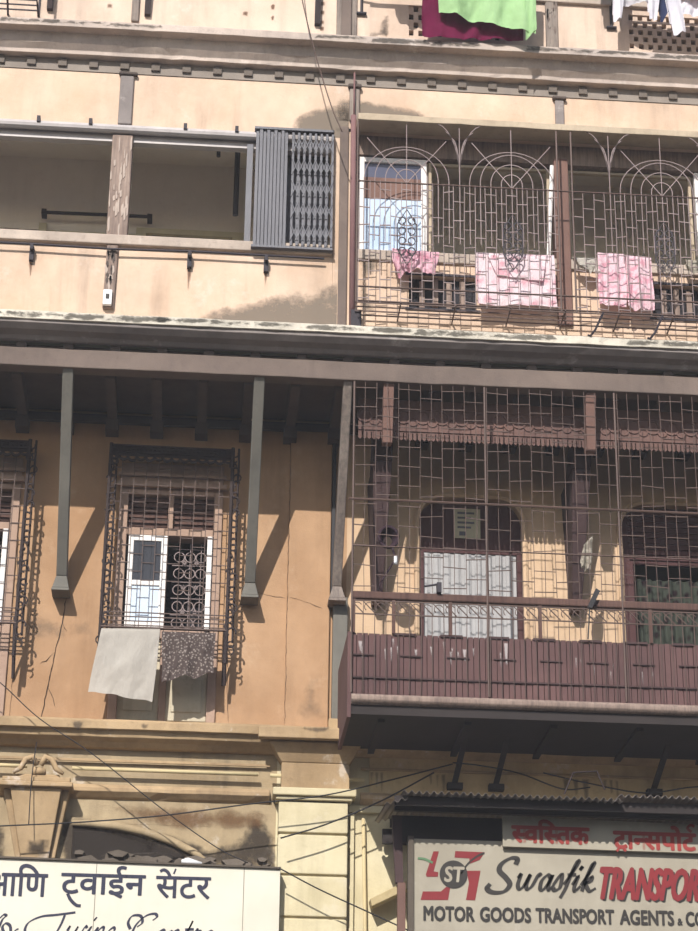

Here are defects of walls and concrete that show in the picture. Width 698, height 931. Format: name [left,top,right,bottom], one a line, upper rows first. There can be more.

water stain [298,102,349,138]
water stain [360,102,421,117]
peeling [107,137,132,235]
water stain [54,289,352,330]
water stain [372,327,475,336]
water stain [141,810,260,826]